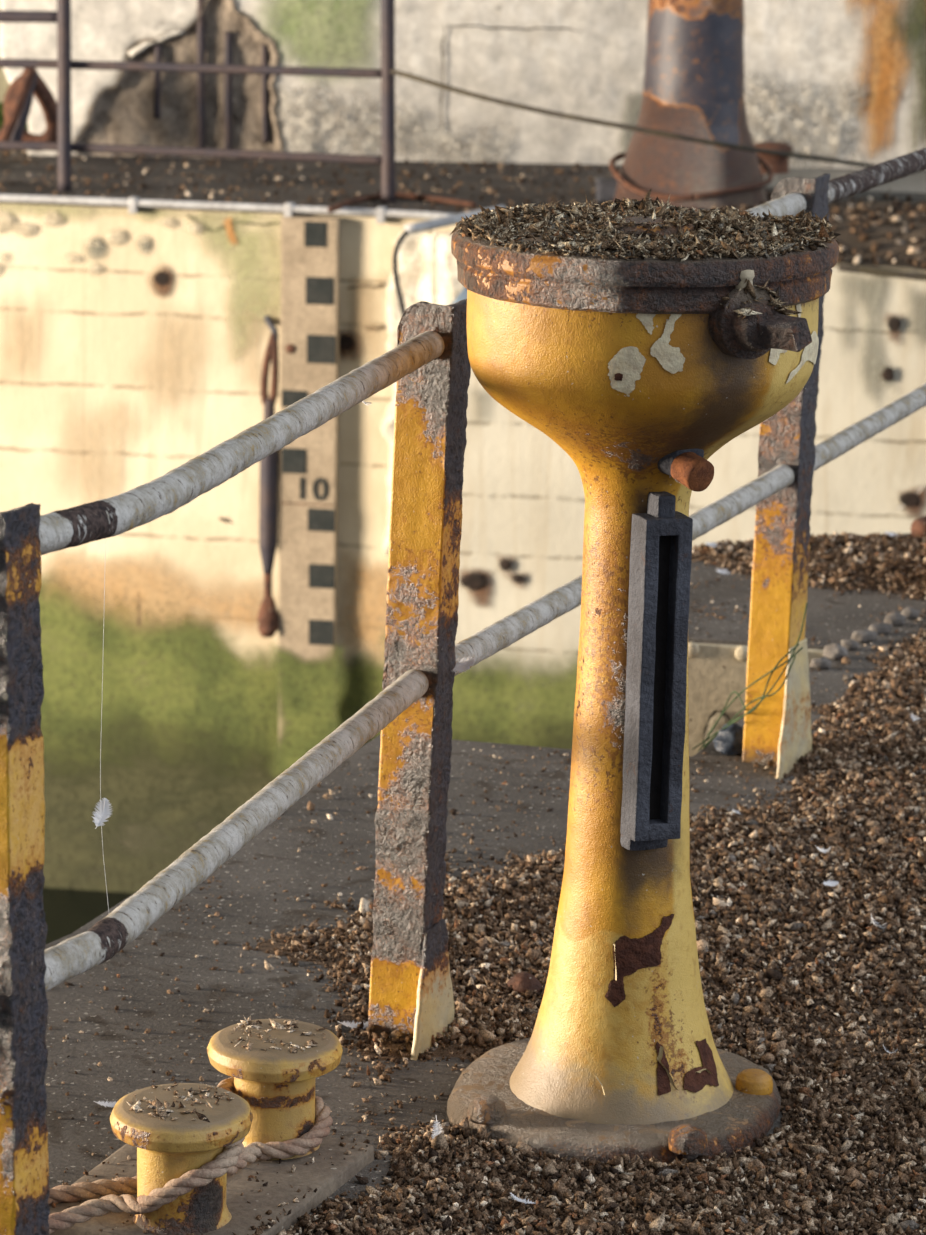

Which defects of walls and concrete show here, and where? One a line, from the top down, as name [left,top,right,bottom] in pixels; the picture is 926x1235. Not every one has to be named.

spalling [74,0,513,163]
rust [847,0,926,154]
peeling [607,314,685,397]
peeling [769,348,787,365]
peeling [786,331,819,384]
rust [460,557,525,605]
damp [43,725,280,893]